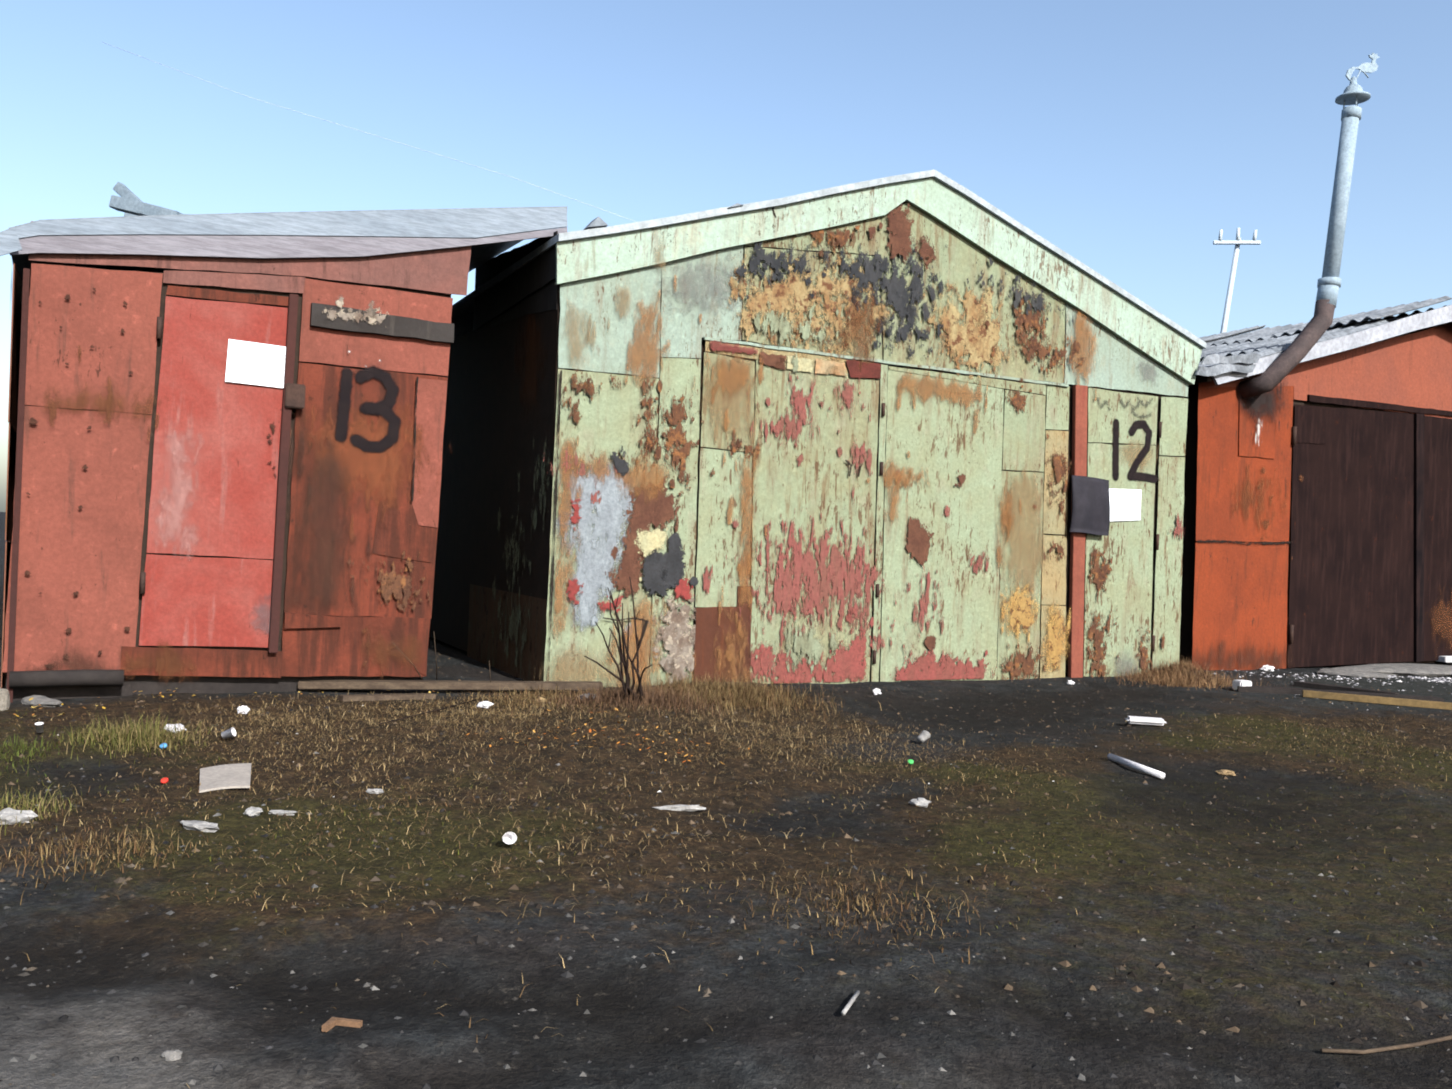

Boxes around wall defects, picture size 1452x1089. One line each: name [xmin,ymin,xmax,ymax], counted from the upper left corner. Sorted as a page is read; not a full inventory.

rust [617,275,677,383]
rust [896,274,1097,434]
peeling [967,257,1074,371]
peeling [491,203,997,684]
rust [994,585,1165,680]